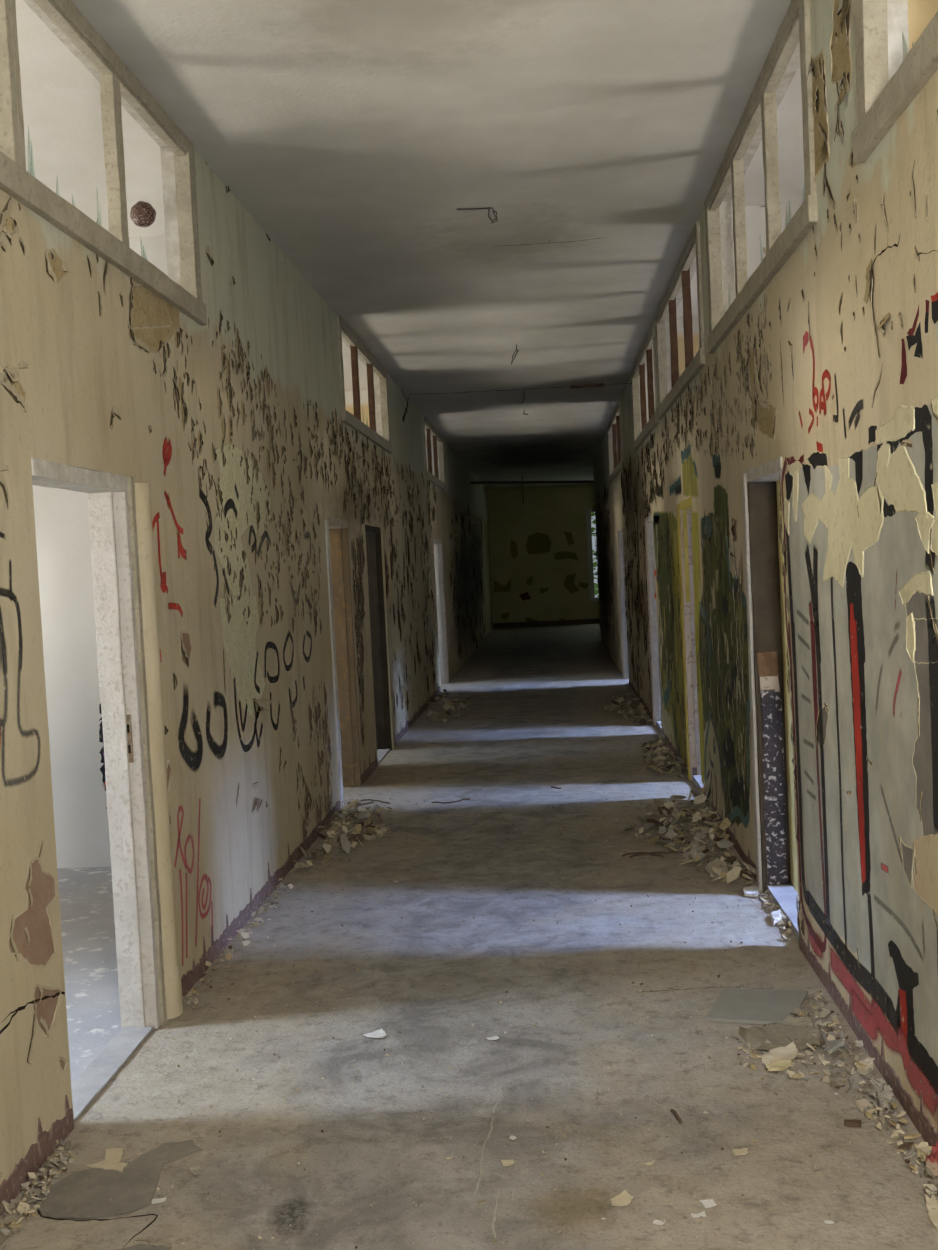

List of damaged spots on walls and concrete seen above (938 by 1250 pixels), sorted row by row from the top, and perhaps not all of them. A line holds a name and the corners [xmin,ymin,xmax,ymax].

peeling [0,196,26,256]
peeling [45,248,70,285]
peeling [806,0,904,408]
peeling [0,360,28,412]
peeling [87,254,436,747]
peeling [510,289,811,744]
peeling [701,508,751,817]
peeling [779,405,938,927]
peeling [279,682,333,843]
peeling [796,894,805,936]
crack [0,991,65,1034]
peeling [85,1148,128,1172]